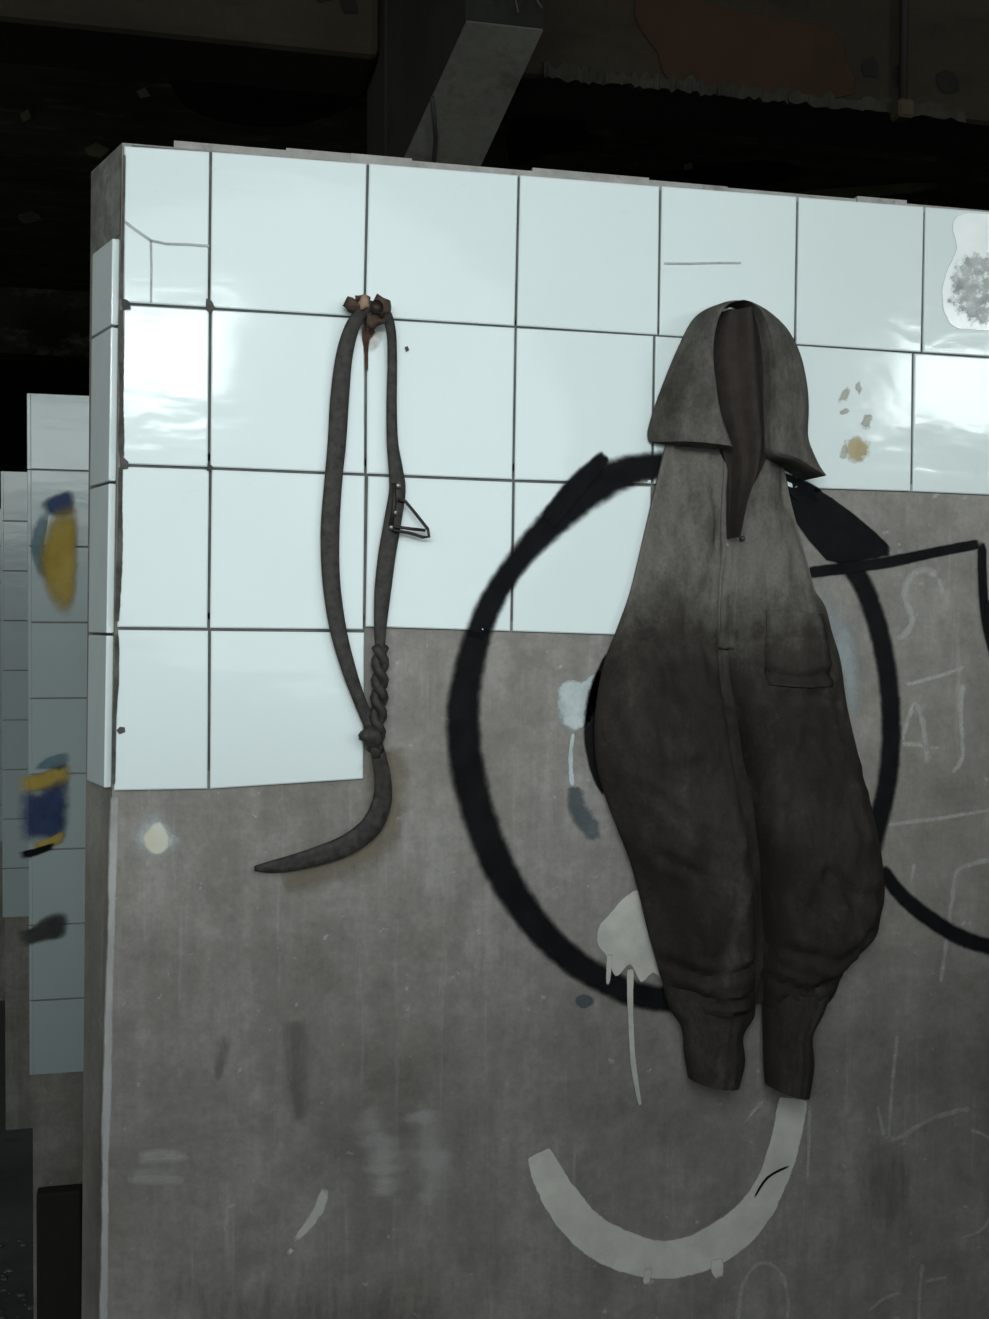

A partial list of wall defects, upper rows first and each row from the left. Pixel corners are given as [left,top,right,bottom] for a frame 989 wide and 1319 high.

rust [840,382,862,414]
rust [841,415,872,461]